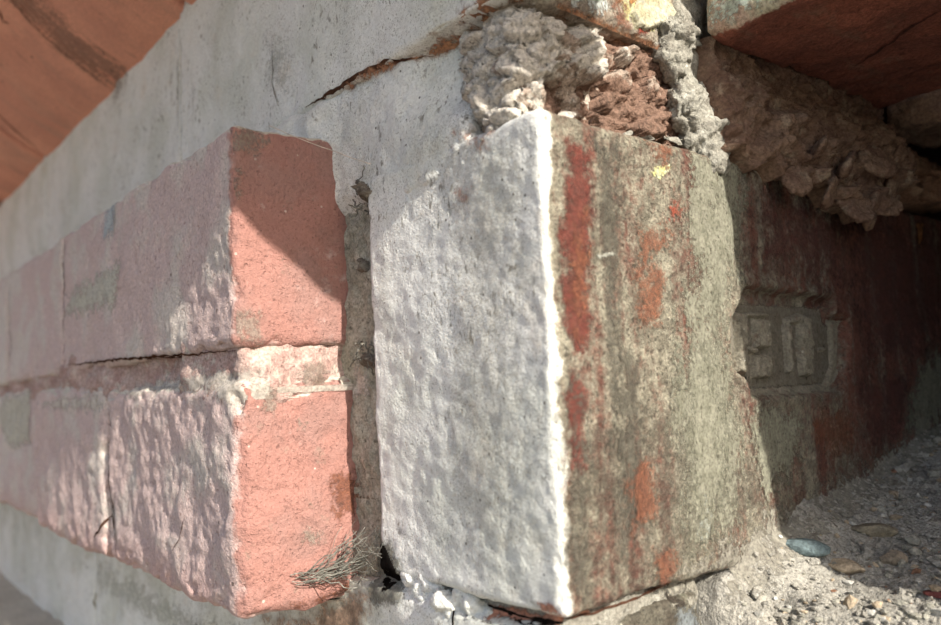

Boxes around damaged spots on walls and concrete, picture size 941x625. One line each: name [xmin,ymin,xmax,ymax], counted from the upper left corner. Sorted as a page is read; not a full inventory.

crack [306,55,432,107]
peeling [347,62,396,90]
spalling [414,0,684,171]
spalling [695,36,941,231]
crack [94,441,116,551]
crack [452,583,669,625]